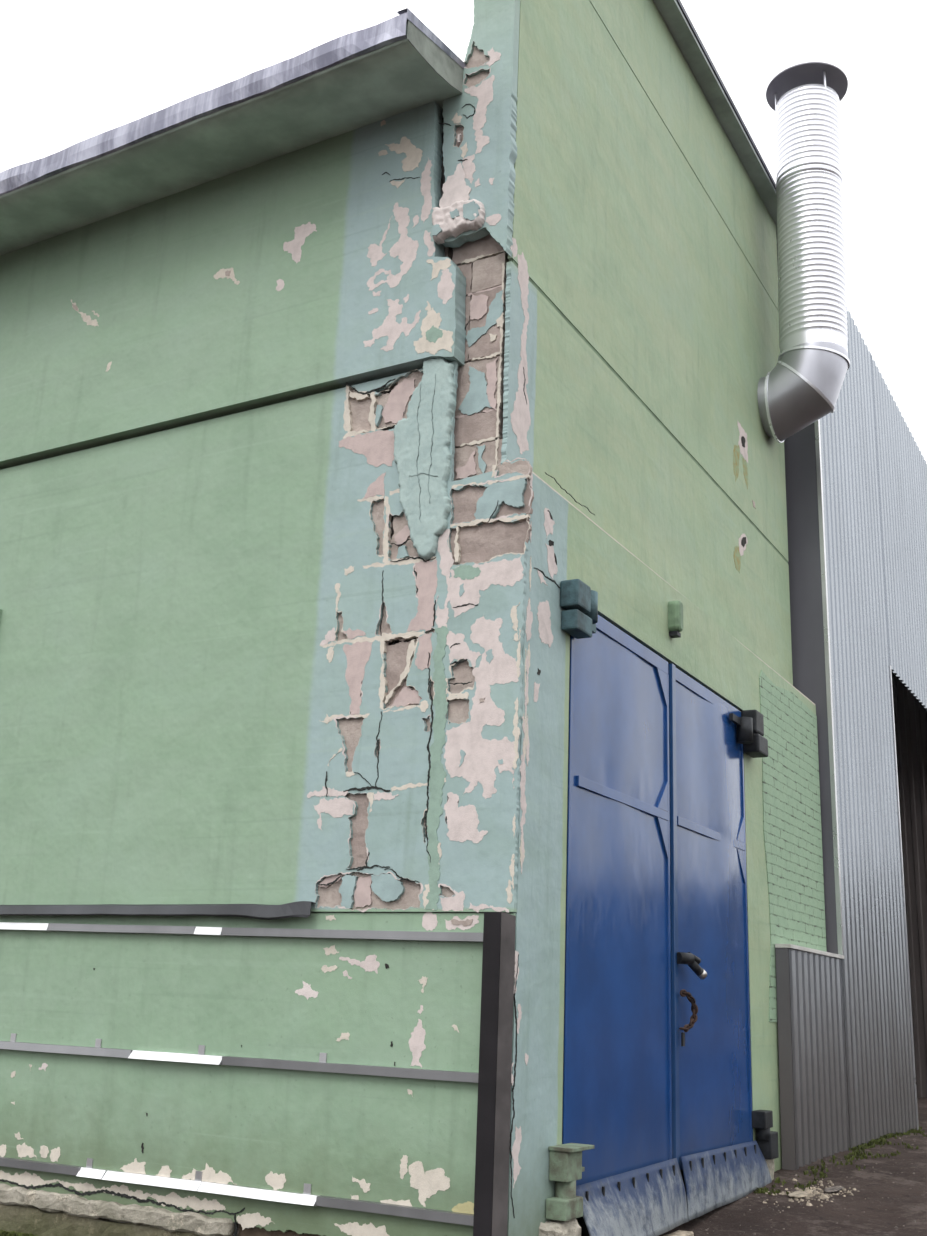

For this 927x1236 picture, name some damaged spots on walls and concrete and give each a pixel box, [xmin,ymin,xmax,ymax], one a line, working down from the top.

crack [439,108,451,198]
peeling [283,222,317,263]
spalling [314,43,558,931]
crack [375,570,393,636]
crack [307,600,436,862]
peeling [321,945,380,979]
peeling [408,976,428,1068]
peeling [0,1132,275,1230]
peeling [351,1177,371,1200]
peeling [334,1222,389,1236]
peeling [380,1155,450,1207]
peeling [452,1201,474,1214]